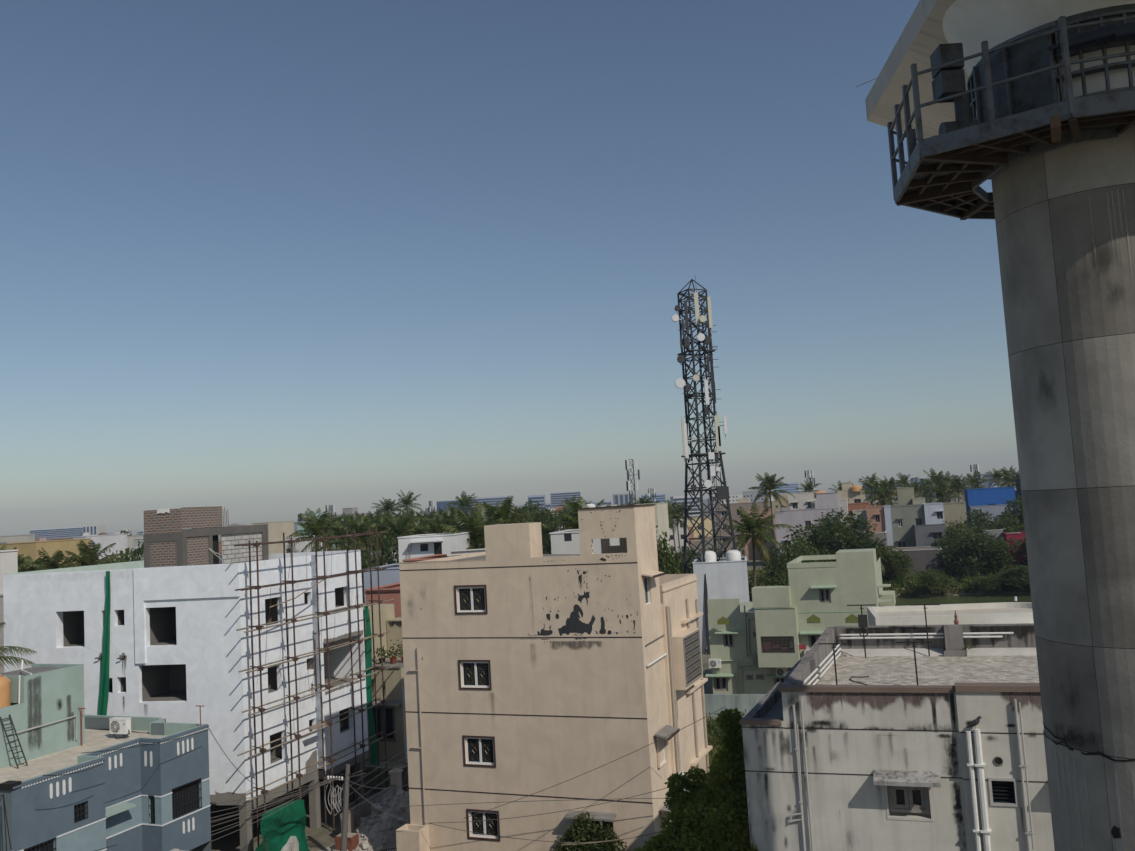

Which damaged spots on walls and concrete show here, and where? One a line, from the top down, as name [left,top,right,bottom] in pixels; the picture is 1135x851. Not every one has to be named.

peeling [528,560,638,643]
water stain [1001,692,1042,727]
water stain [764,692,972,847]